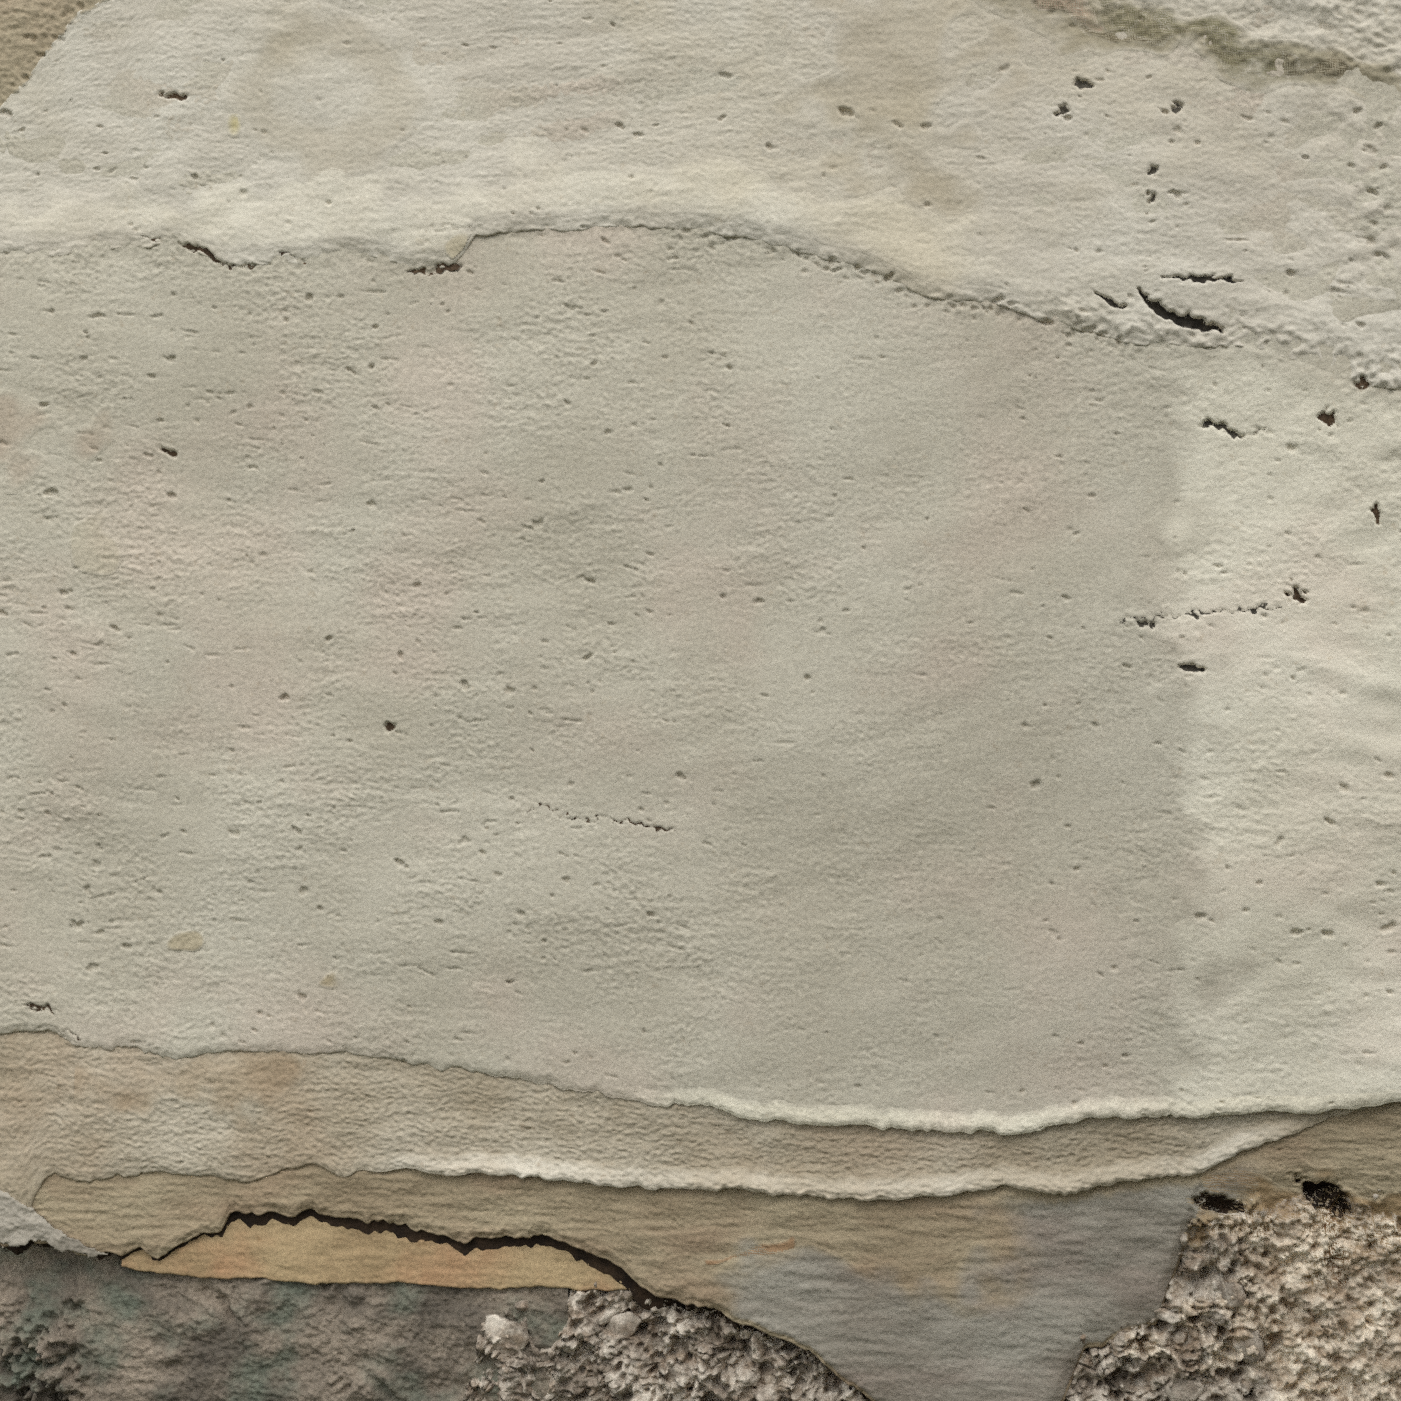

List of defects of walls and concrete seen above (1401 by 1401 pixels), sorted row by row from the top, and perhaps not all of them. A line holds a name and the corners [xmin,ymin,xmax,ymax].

crack [151,238,306,270]
crack [408,263,462,276]
crack [1095,274,1238,334]
crack [0,1241,54,1255]
flaking render [0,1190,108,1258]
crack [96,1209,870,1401]
spalling [1064,1189,1401,1401]
spalling [463,1282,871,1401]